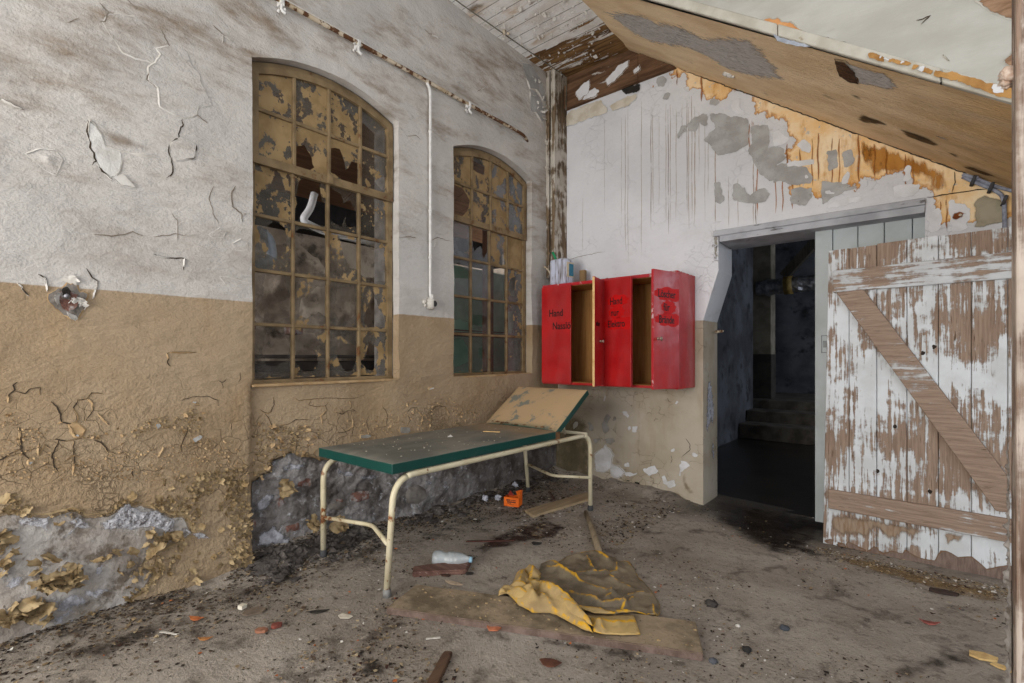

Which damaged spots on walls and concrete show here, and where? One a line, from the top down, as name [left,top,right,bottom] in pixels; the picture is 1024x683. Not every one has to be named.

peeling [566,94,638,127]
peeling [86,119,197,188]
peeling [676,99,857,206]
crack [94,186,247,270]
peeling [926,200,970,233]
spalling [47,274,89,321]
crack [0,382,134,478]
crack [158,427,188,458]
crack [259,395,450,437]
peeling [573,411,698,488]
spalling [0,397,557,643]